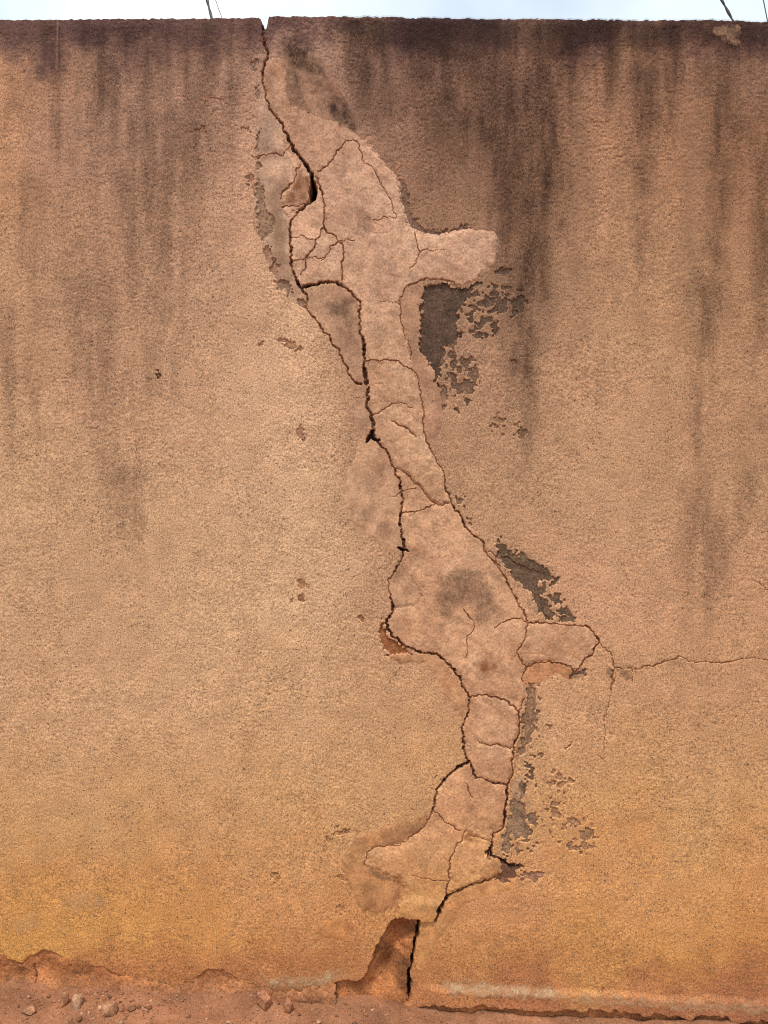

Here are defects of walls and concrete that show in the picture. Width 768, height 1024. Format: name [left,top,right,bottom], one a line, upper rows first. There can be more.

flaking render [241,127,306,308]
flaking render [399,179,472,236]
flaking render [277,338,303,353]
flaking render [418,267,528,414]
flaking render [489,412,528,439]
crack [251,24,768,994]
flaking render [290,579,310,603]
flaking render [492,536,576,622]
flaking render [379,618,412,656]
flaking render [498,683,598,883]